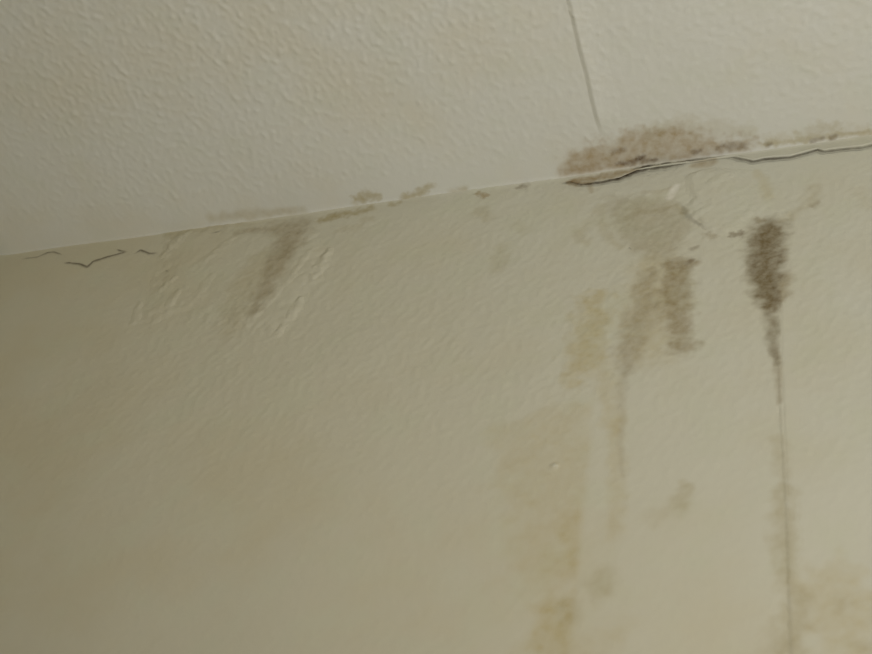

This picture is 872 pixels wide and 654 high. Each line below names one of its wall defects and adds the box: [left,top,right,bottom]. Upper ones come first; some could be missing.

crack [562,144,872,186]
crack [24,249,156,268]
leakage [160,181,498,345]
leakage [468,181,829,654]